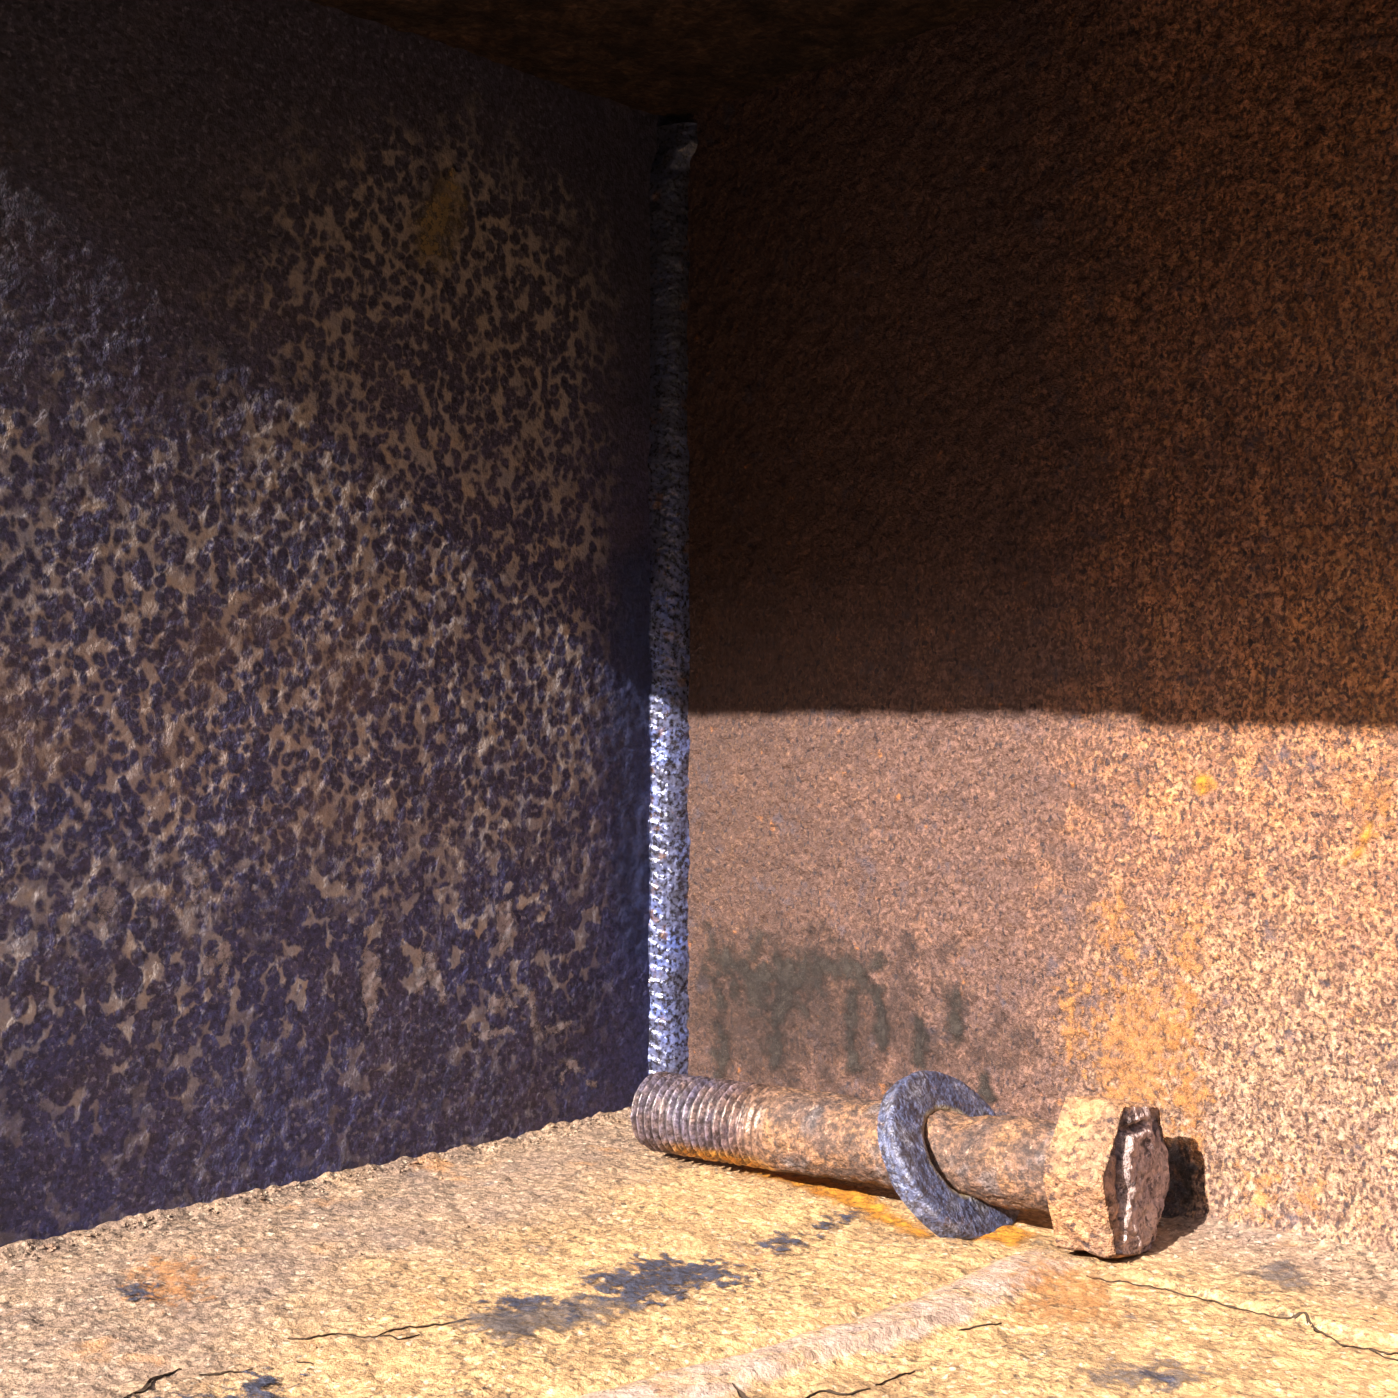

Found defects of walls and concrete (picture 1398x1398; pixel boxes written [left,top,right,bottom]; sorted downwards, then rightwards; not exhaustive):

water stain [701,923,889,1079]
water stain [911,1016,928,1069]
water stain [945,988,964,1045]
corrosion [1053,895,1218,1161]
water stain [978,1072,996,1103]
corrosion [733,1163,931,1237]
corrosion [979,1225,1032,1247]
water stain [436,1206,869,1349]
crack [287,1315,489,1365]
crack [1086,1275,1398,1361]
crack [123,1368,253,1398]
water stain [152,1367,305,1398]